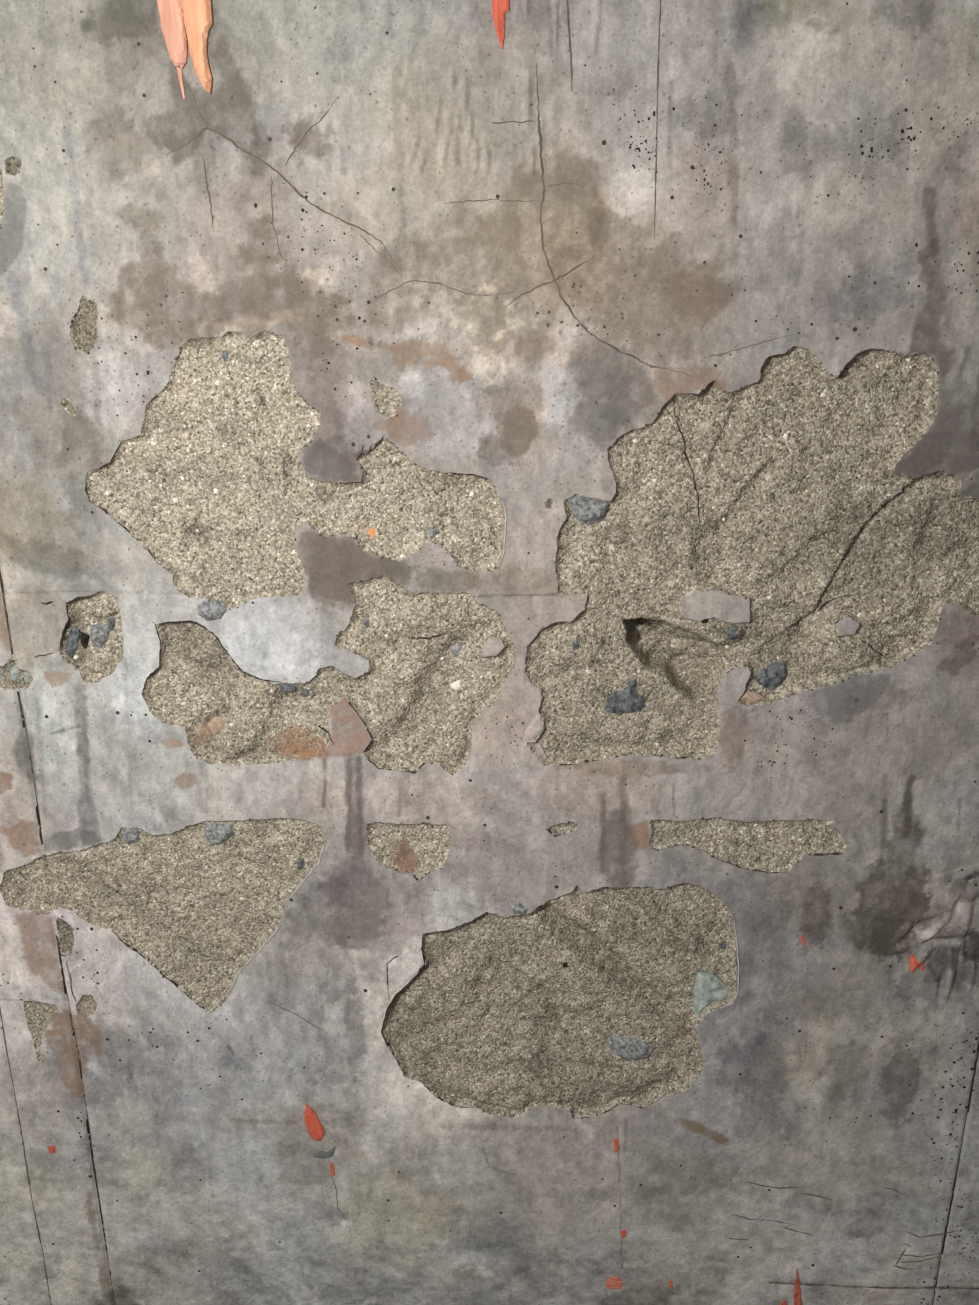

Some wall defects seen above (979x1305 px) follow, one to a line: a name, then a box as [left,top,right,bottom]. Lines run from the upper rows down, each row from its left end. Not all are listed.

crack [565,0,573,93]
damp [157,70,252,163]
crack [653,0,661,228]
crack [166,63,789,377]
damp [454,280,518,336]
spalling [85,331,979,776]
spalling [59,591,124,683]
spalling [649,817,847,873]
damp [895,777,922,840]
spalling [0,818,325,1013]
damp [853,865,931,955]
spalling [373,882,739,1119]